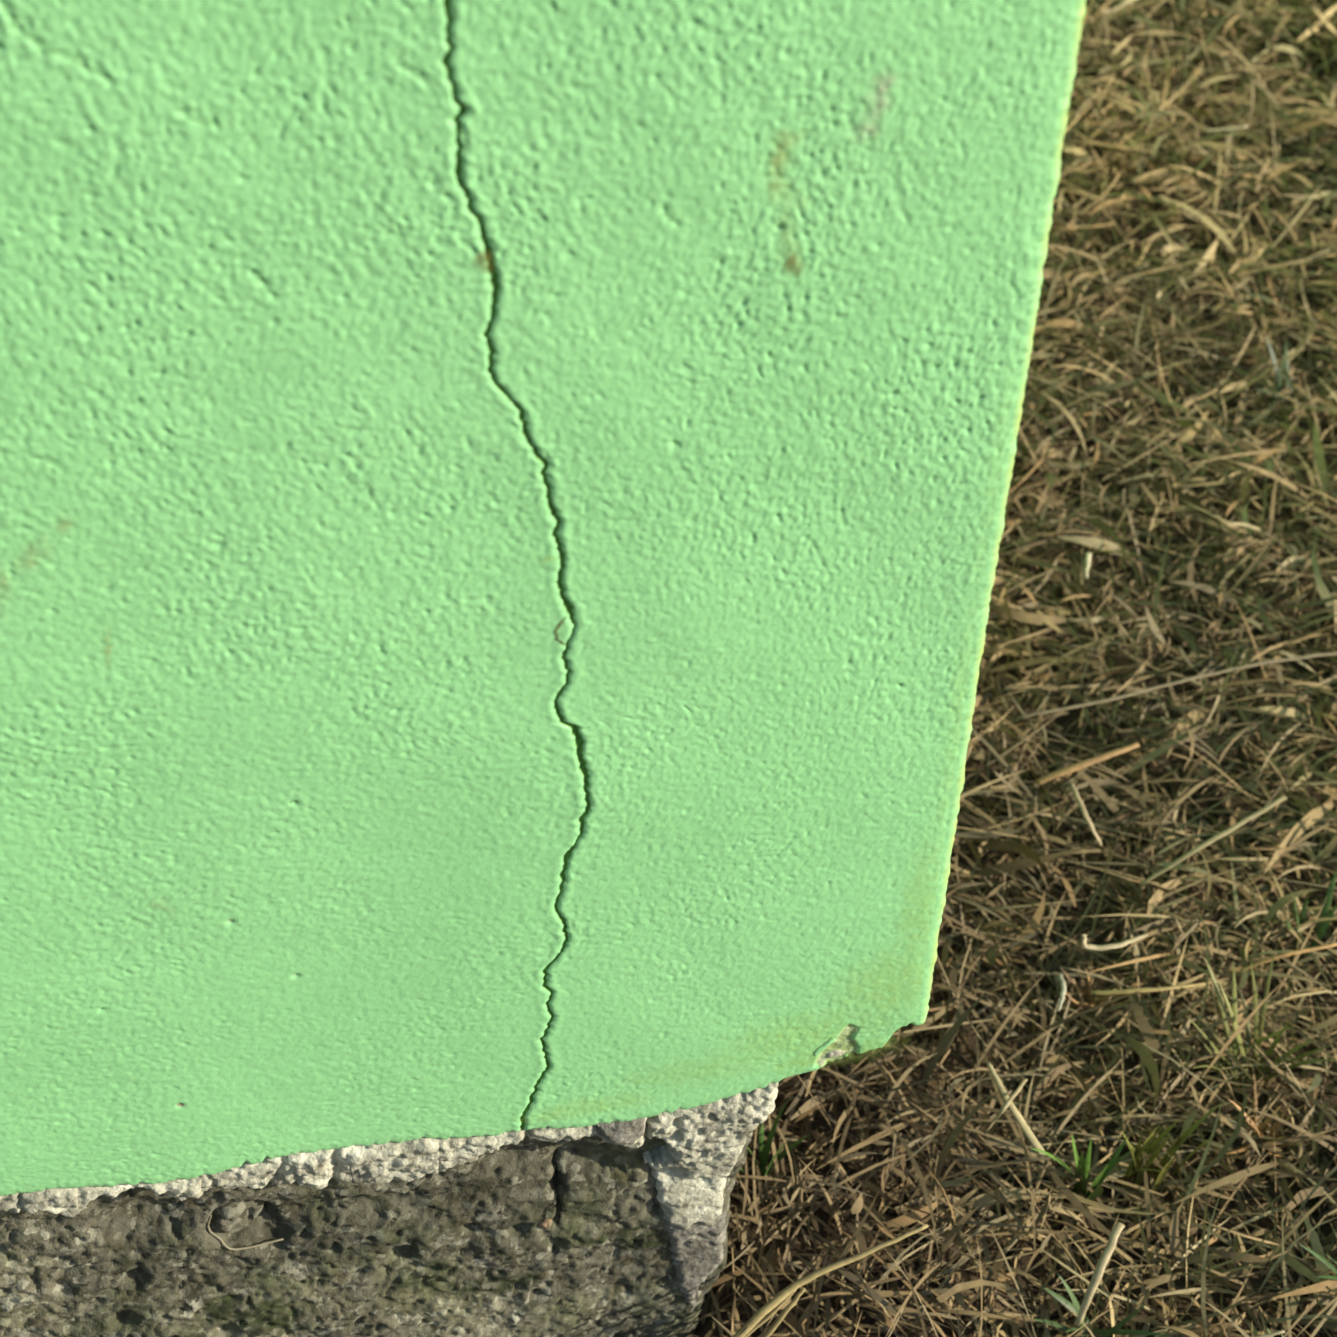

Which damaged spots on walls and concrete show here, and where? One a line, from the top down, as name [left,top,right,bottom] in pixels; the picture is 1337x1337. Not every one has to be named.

crack [442,0,591,1130]
spalling [0,1082,779,1310]
crack [543,1148,563,1225]